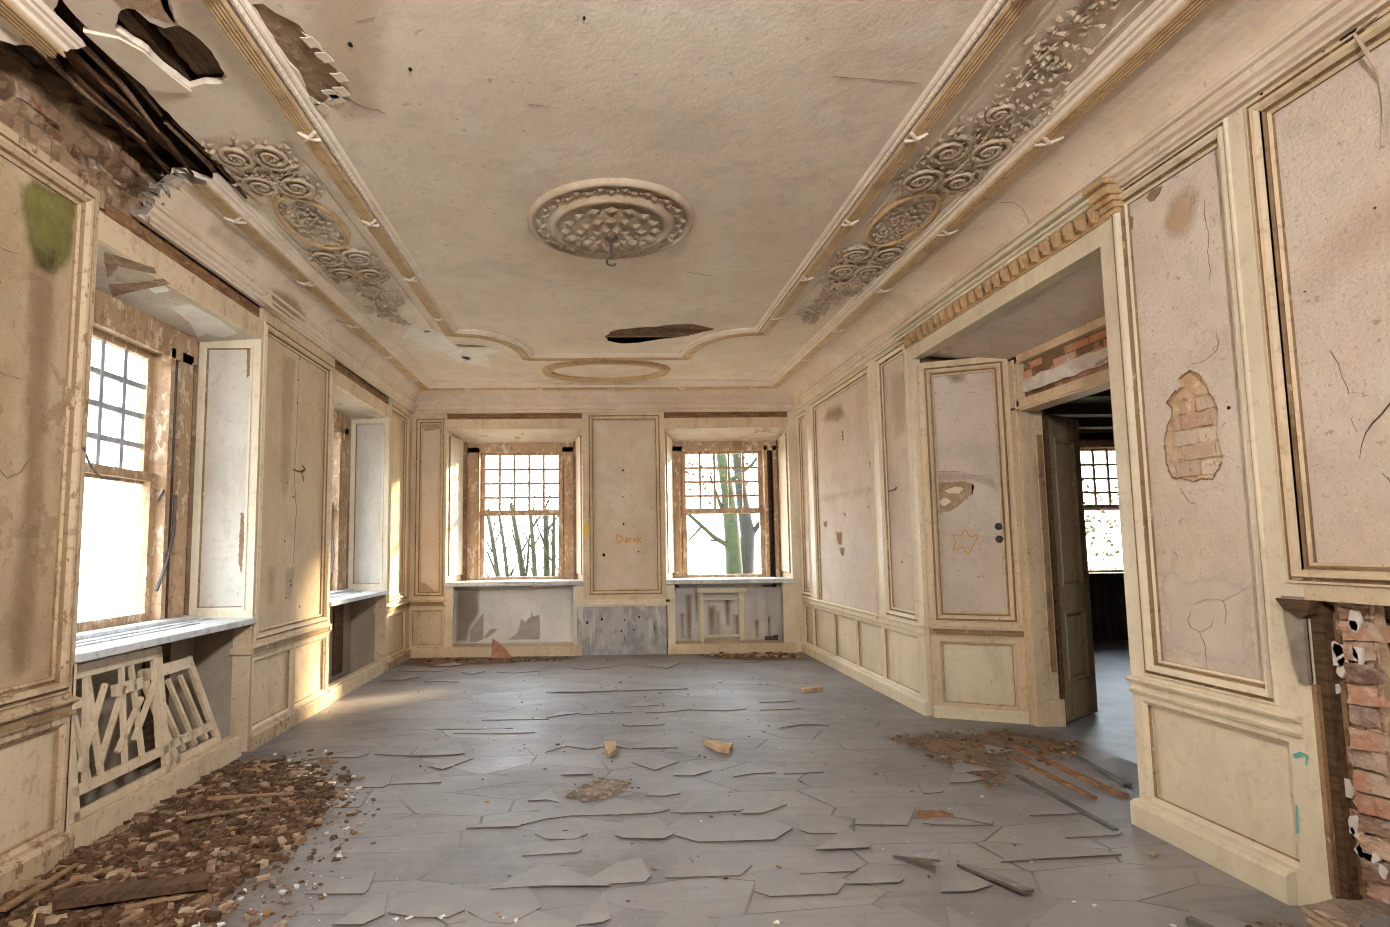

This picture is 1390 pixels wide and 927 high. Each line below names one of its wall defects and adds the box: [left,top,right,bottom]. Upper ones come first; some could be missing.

spalling [0,40,38,65]
peeling [115,0,178,26]
peeling [254,3,351,112]
spalling [0,81,143,233]
peeling [605,324,713,337]
spalling [1163,370,1224,483]
crack [1330,351,1390,482]